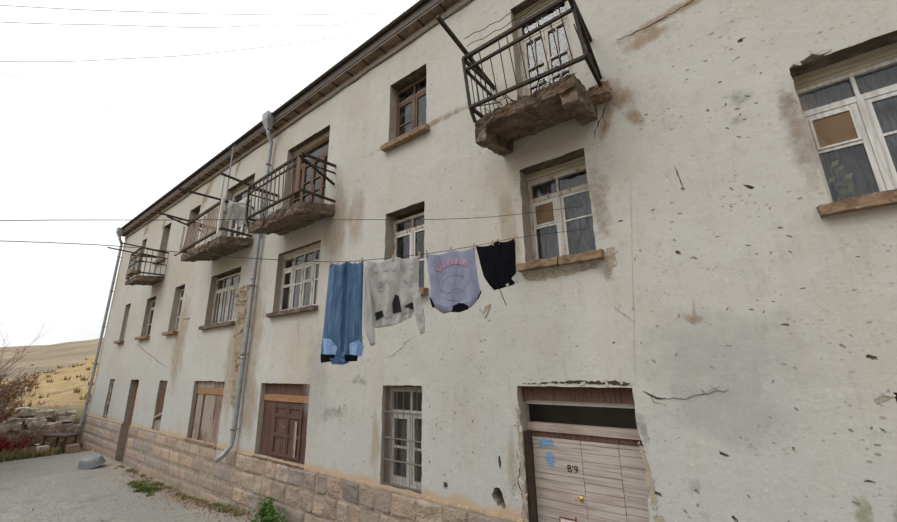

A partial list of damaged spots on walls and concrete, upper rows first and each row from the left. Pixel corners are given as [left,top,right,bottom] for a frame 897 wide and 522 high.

crack [618,0,694,40]
crack [614,255,636,321]
flaking render [229,284,251,409]
flaking render [522,379,633,387]
crack [643,387,729,403]
hole [492,487,506,509]
flaking render [637,437,665,522]